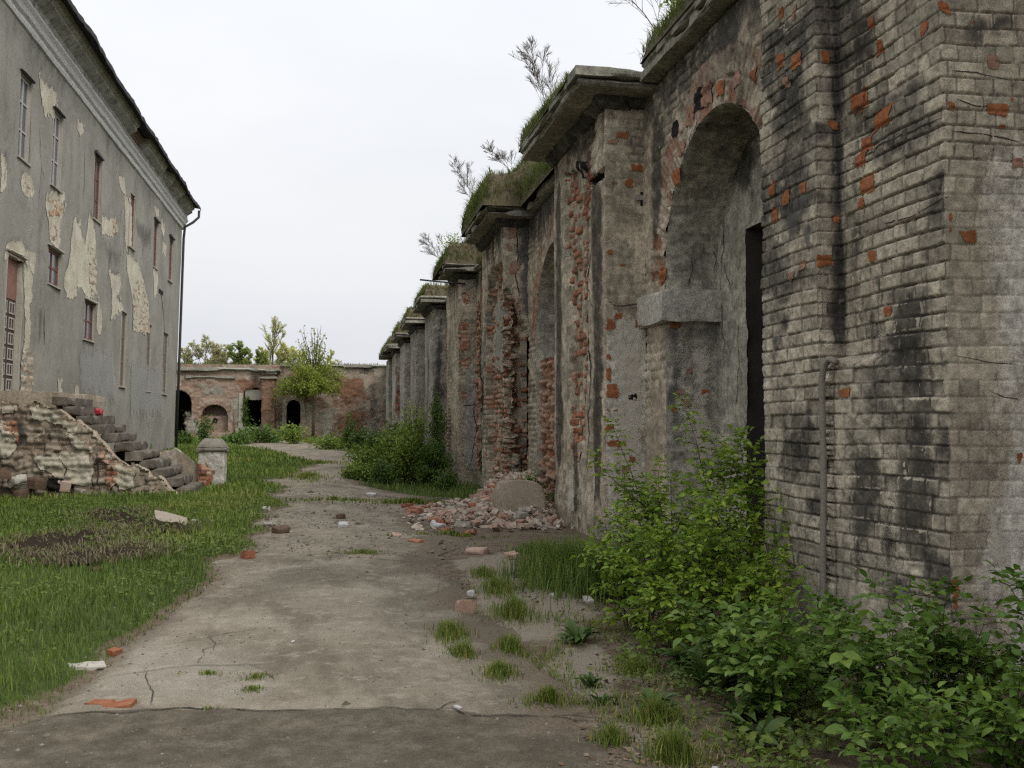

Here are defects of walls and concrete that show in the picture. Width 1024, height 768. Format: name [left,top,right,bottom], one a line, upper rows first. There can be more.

peeling [39,72,58,121]
spalling [850,86,894,210]
peeling [4,239,36,391]
peeling [20,168,158,335]
peeling [484,244,520,372]
spalling [564,161,643,461]
water stain [891,291,934,569]
water stain [849,451,880,574]
crack [38,628,640,719]